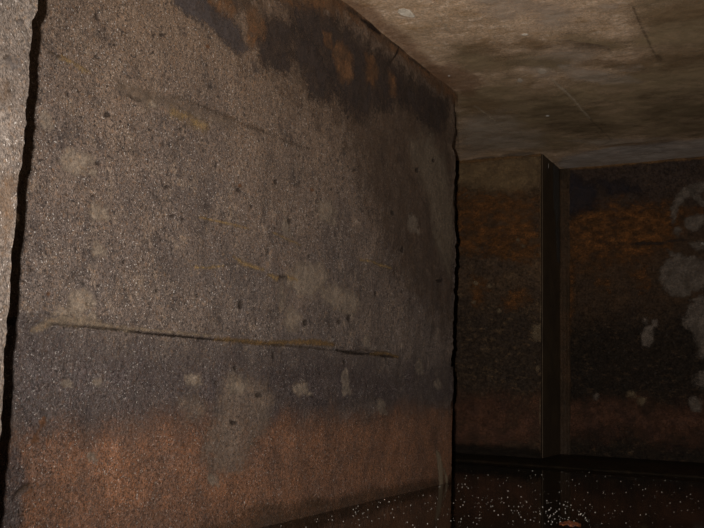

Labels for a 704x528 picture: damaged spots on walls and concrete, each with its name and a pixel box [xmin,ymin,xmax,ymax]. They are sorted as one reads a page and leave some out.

damp [173,0,248,54]
damp [256,0,704,319]
crack [30,315,399,358]
corrosion [0,407,453,528]